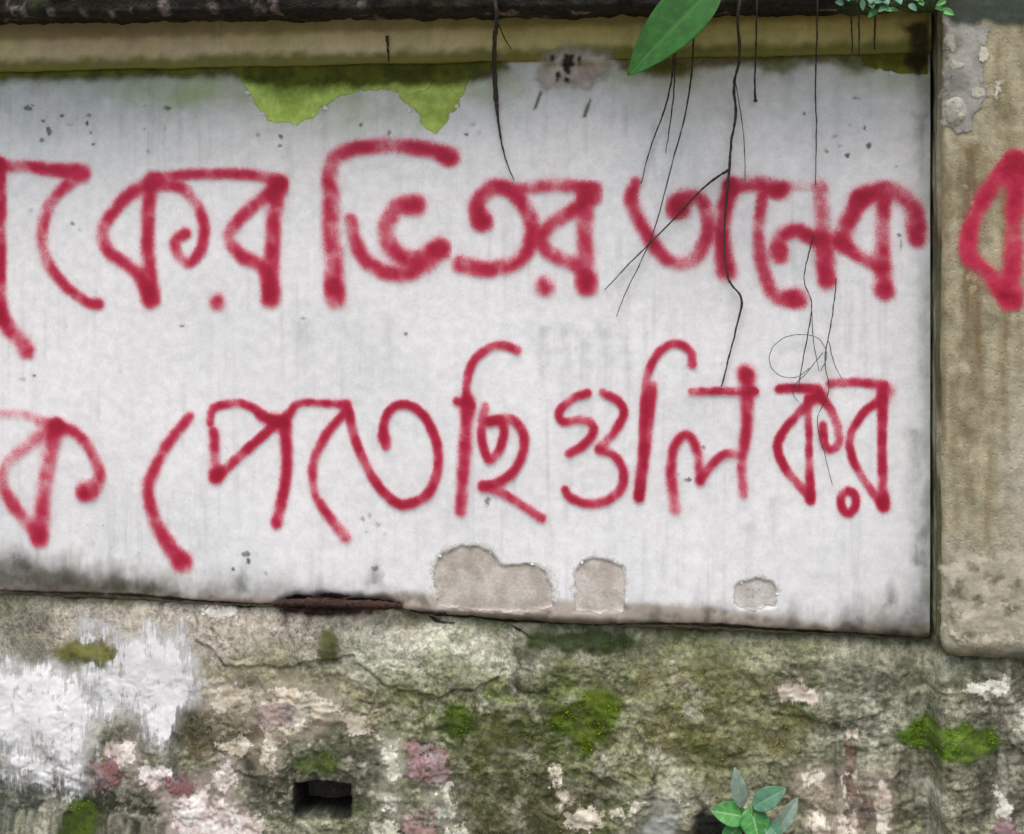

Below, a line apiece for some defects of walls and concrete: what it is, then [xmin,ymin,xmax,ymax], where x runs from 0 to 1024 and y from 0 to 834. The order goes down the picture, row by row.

flaking render [534,47,610,117]
flaking render [940,15,1004,134]
peeling [240,78,469,146]
damp [0,563,177,597]
corrosion [272,592,402,616]
flaking render [429,542,628,615]
flaking render [734,574,782,612]
peeling [776,679,821,707]
peeling [846,728,859,740]
peeling [801,770,827,790]
peeling [806,769,894,834]